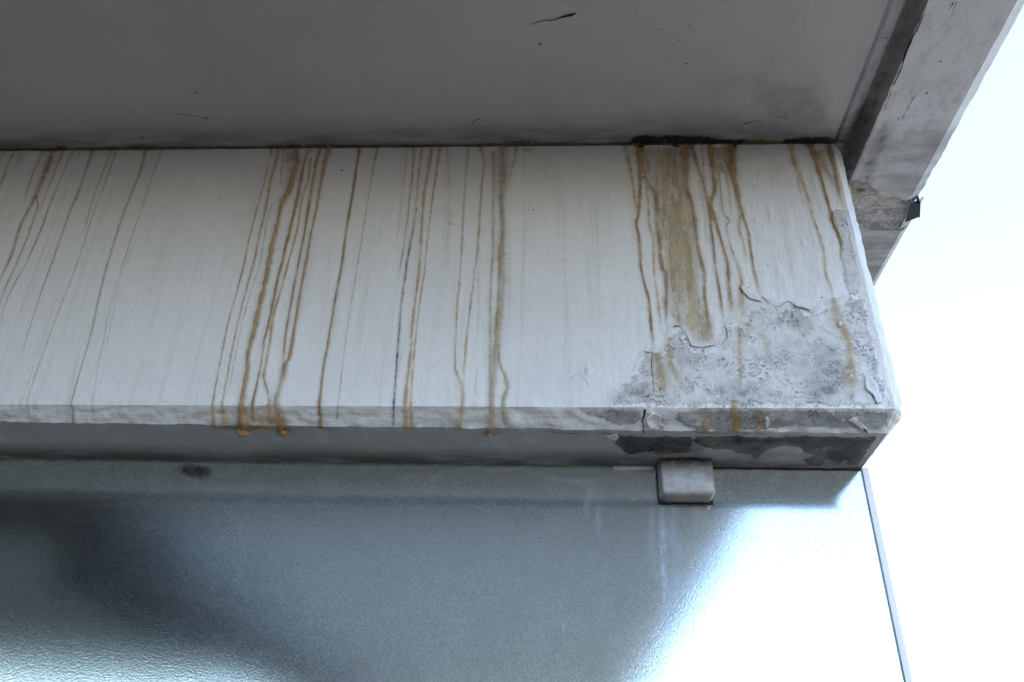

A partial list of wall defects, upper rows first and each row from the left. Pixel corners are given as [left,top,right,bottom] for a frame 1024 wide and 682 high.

rust [211,147,332,431]
rust [404,261,425,430]
rust [409,147,440,249]
water stain [0,110,869,434]
rust [628,144,757,339]
peeling [588,212,890,466]
rust [807,144,842,250]
rust [840,324,853,369]
spalling [851,181,879,196]